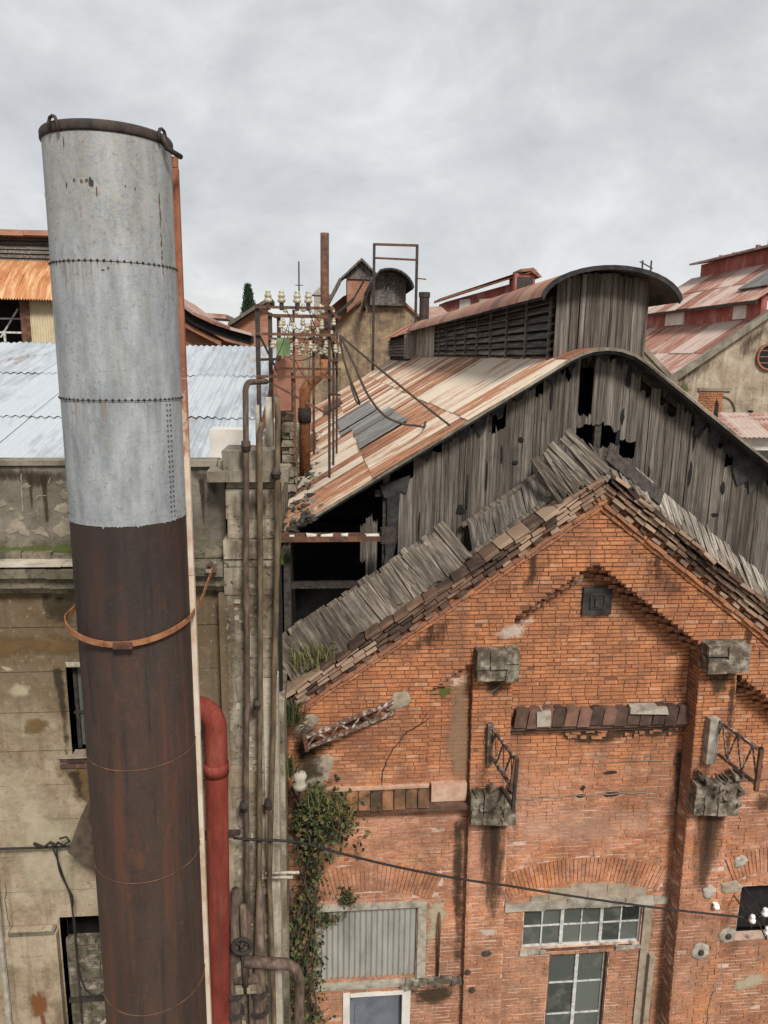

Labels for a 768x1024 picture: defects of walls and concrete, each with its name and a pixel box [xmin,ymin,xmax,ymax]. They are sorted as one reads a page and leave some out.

flaking render [0,480,70,538]
leakage [22,669,68,743]
crack [381,713,428,786]
leakage [483,825,504,910]
leakage [694,815,723,886]
rust [31,993,47,1024]